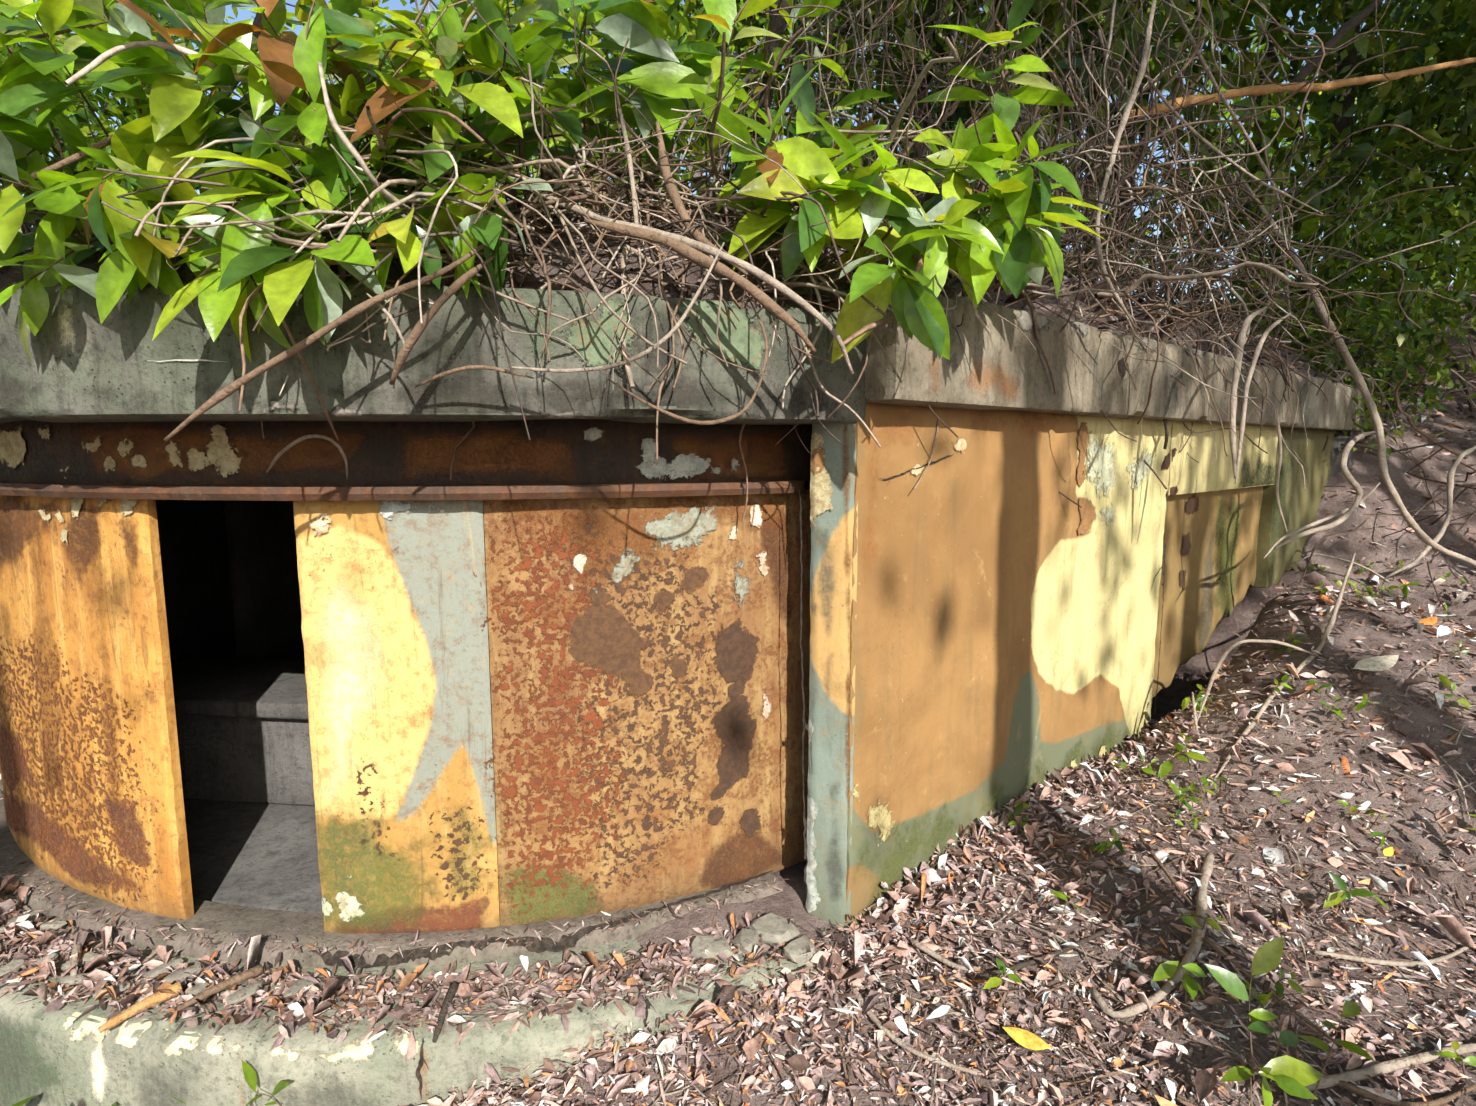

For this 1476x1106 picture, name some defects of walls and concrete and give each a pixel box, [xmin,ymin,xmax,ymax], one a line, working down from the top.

peeling [0,425,50,469]
peeling [82,436,147,473]
peeling [165,424,242,477]
rust [82,429,361,478]
peeling [636,437,740,480]
rust [0,496,100,580]
rust [121,521,137,564]
rust [503,497,791,623]
rust [0,728,136,888]
rust [105,799,150,867]
rust [700,830,781,889]
crack [416,1039,429,1101]